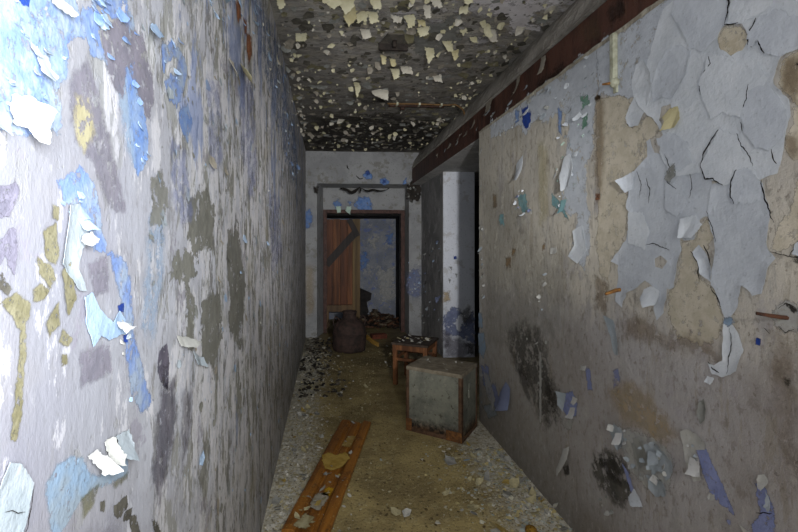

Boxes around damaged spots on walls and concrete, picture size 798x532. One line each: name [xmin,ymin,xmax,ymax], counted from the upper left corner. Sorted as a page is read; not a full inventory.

peeling [0,0,195,413]
spalling [149,0,573,451]
peeling [489,0,798,384]
damp [511,326,557,427]
peeling [555,391,577,430]
peeling [0,462,34,532]
peeling [45,429,140,532]
damp [592,449,631,516]
peeling [606,424,674,507]
peeling [680,429,734,524]
peeling [740,474,776,532]